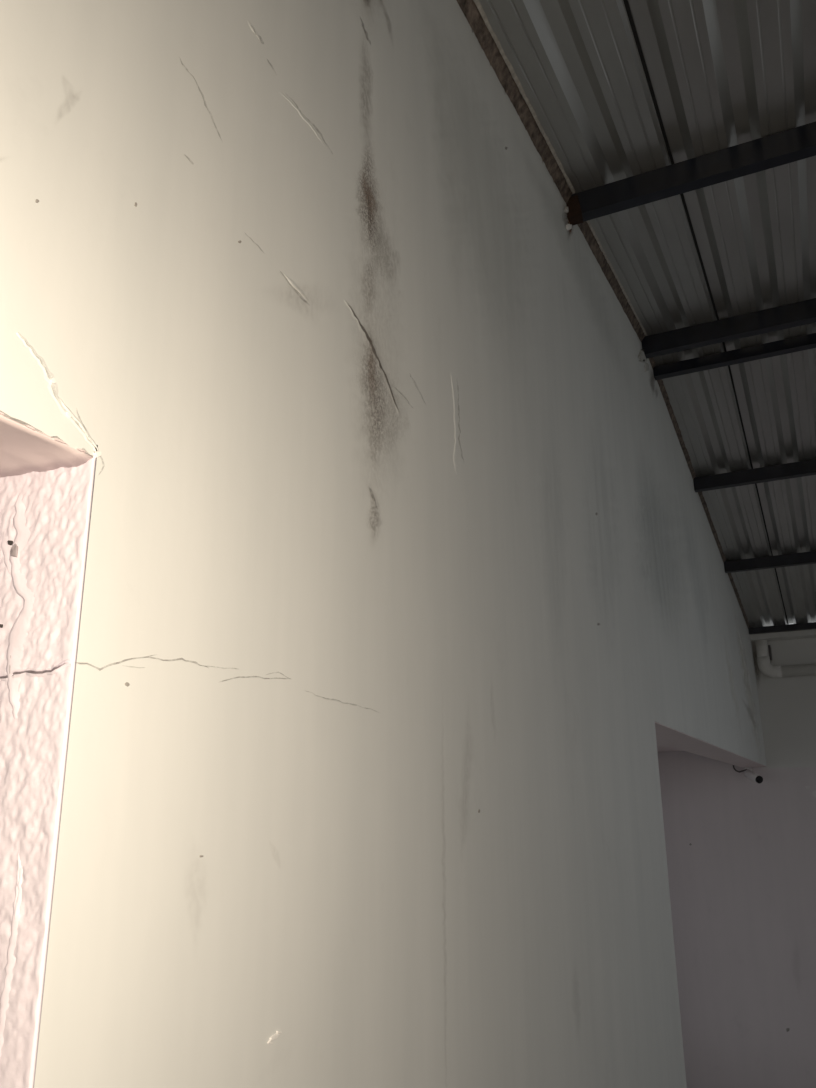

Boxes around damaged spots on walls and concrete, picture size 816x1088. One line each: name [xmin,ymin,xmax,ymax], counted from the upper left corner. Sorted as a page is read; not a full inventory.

crack [16,332,101,458]
crack [344,301,400,414]
crack [0,658,72,681]